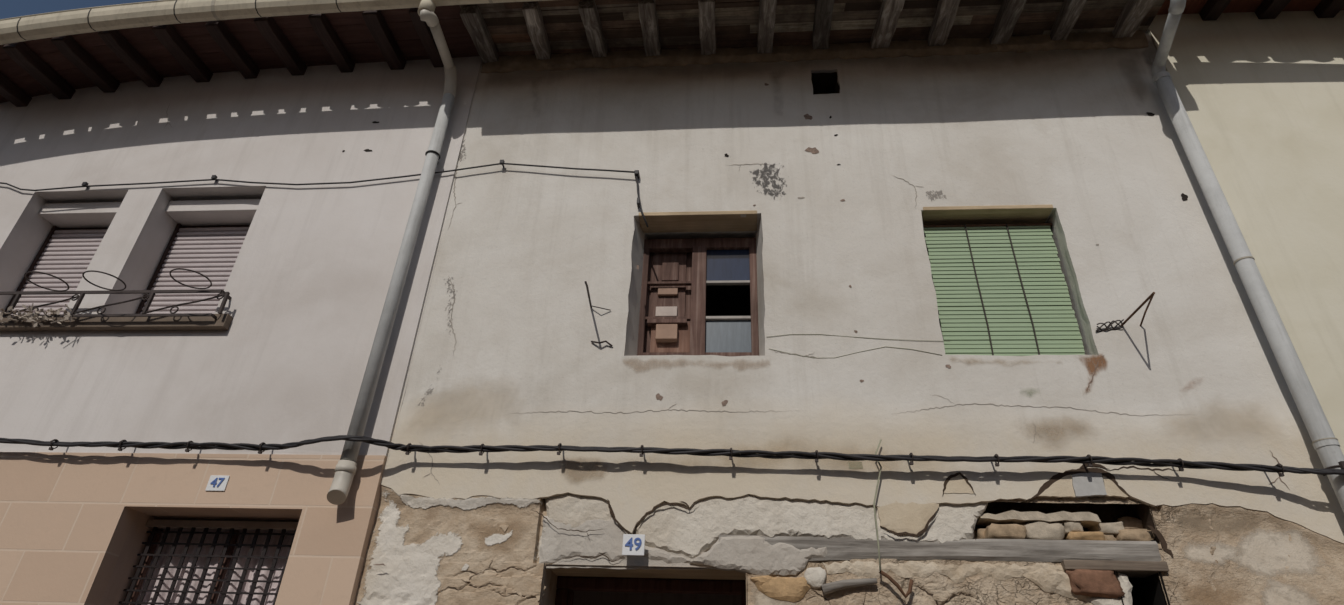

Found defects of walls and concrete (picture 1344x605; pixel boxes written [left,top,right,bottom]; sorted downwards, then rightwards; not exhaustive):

corrosion [1086,355,1106,374]
flaking render [354,472,1344,605]
crack [905,585,975,605]